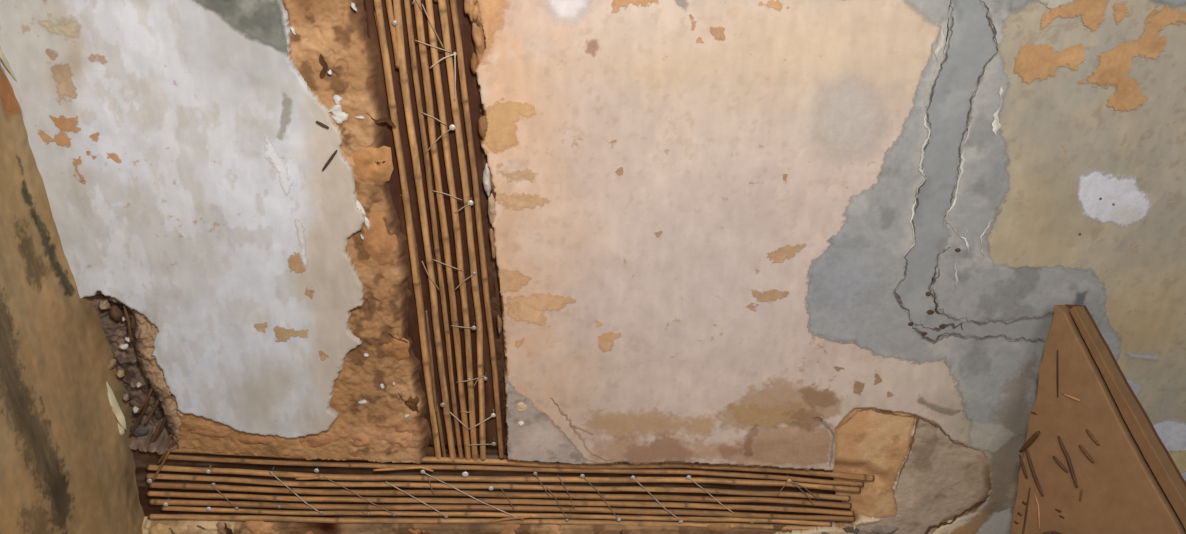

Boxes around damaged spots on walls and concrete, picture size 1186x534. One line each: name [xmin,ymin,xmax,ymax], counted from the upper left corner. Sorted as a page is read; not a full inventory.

damp [0,75,21,113]
peeling [46,48,77,101]
peeling [1014,0,1186,112]
peeling [38,115,121,184]
spalling [175,0,442,464]
spalling [464,0,576,426]
crack [894,0,1054,344]
spalling [106,382,127,436]
damp [591,382,839,464]
spalling [832,370,1016,534]
damp [46,463,70,524]
spalling [142,516,799,534]